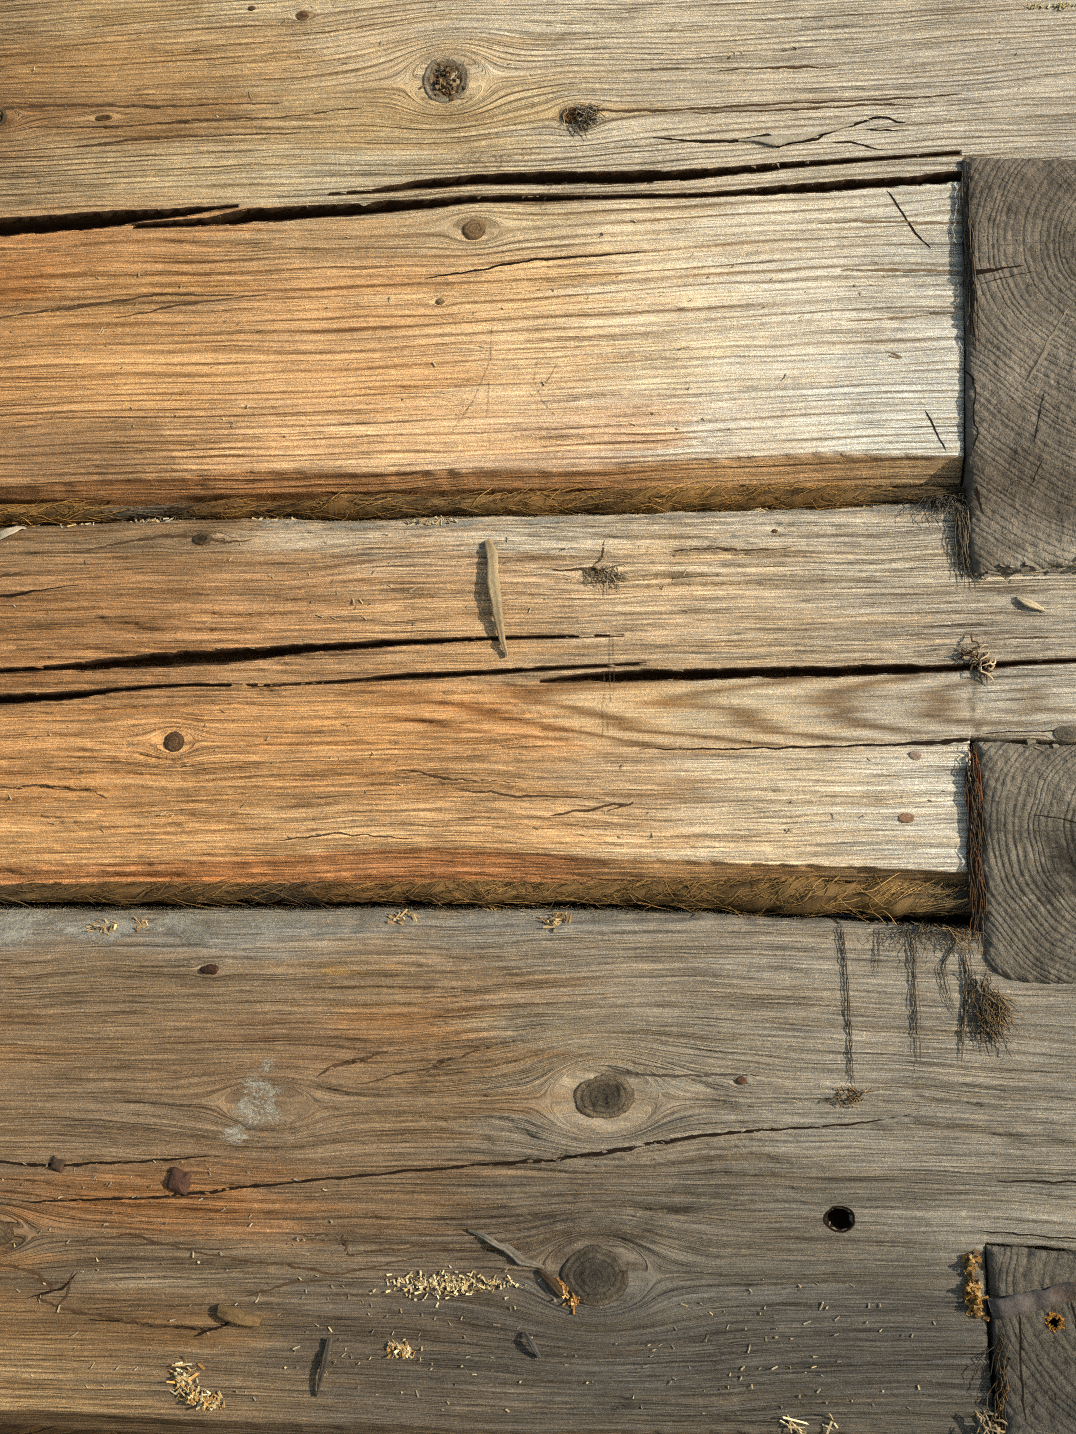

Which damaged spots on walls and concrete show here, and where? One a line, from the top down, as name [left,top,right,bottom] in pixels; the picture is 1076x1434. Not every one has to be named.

crack [0,65,1034,284]
crack [0,293,271,319]
crack [850,312,955,358]
crack [1025,297,1076,482]
crack [0,633,1076,705]
crack [644,730,1054,750]
crack [0,784,107,799]
crack [395,769,634,816]
crack [276,832,410,841]
crack [0,1114,911,1337]
rust [1044,1312,1065,1333]
crack [1019,1315,1027,1420]